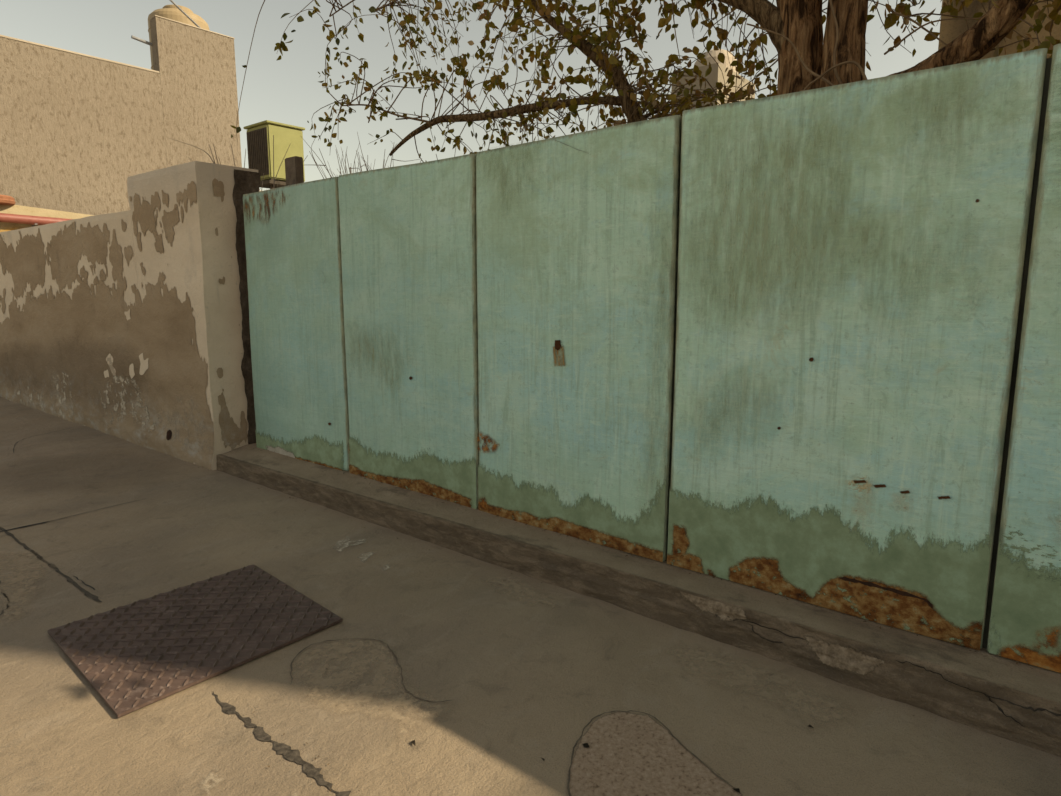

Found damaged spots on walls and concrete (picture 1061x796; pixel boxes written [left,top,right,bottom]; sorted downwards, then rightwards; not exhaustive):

corrosion [477,433,497,452]
peeling [0,169,1061,663]
corrosion [266,446,983,651]
spalling [804,636,885,675]
corrosion [999,628,1061,673]
crack [896,660,1061,727]